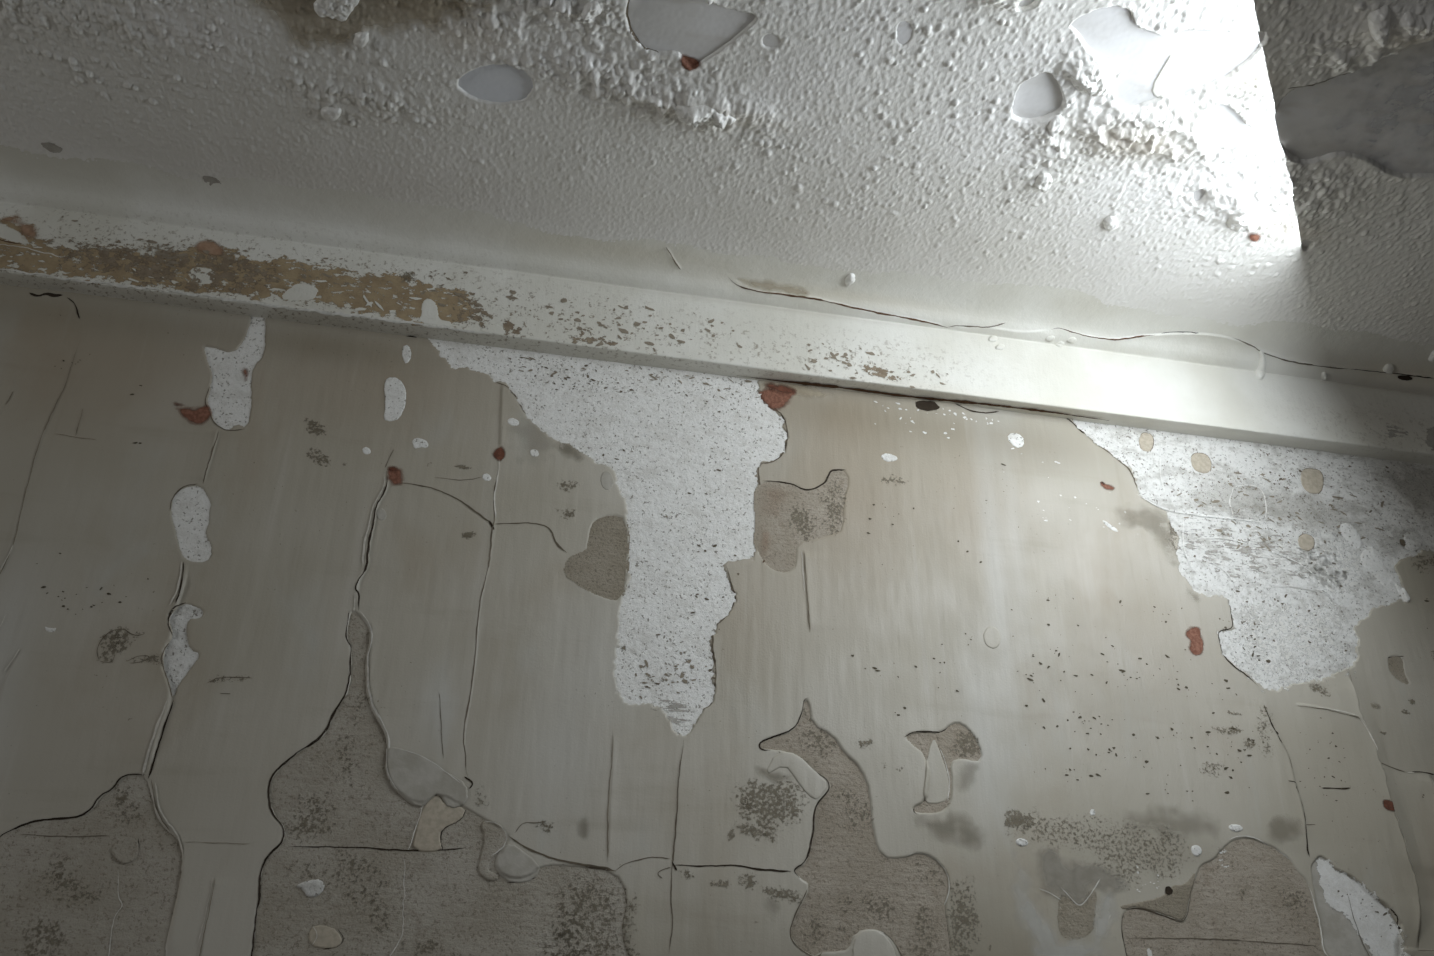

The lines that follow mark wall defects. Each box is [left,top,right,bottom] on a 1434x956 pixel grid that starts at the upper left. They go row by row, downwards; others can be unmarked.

peeling [1200,41,1434,173]
corrosion [758,383,796,410]
crack [730,279,1005,350]
crack [1045,328,1196,347]
crack [1234,338,1431,381]
peeling [0,217,848,736]
crack [353,451,566,789]
corrosion [1186,627,1204,655]
peeling [1072,419,1434,692]
peeling [251,611,629,956]
crack [1264,706,1350,857]
peeling [1005,809,1411,956]